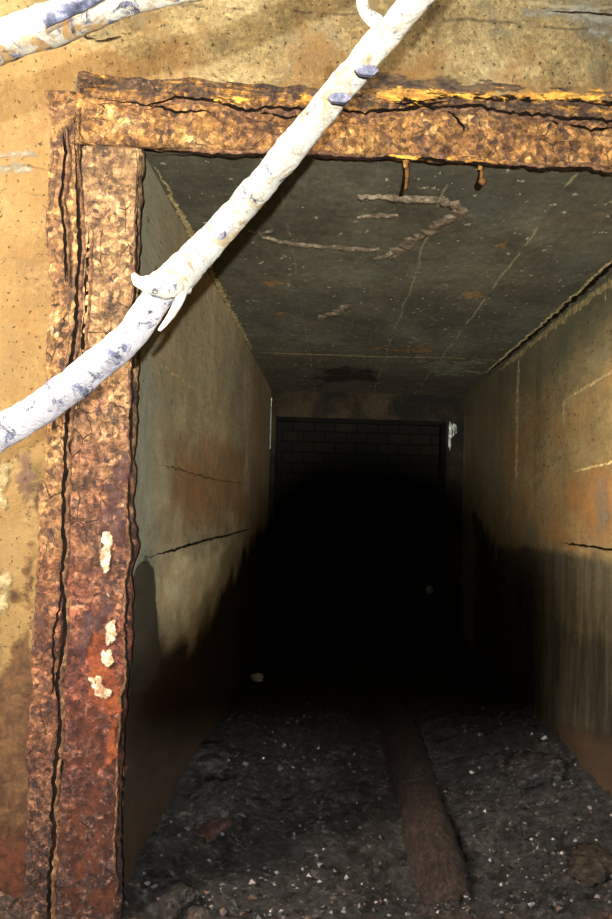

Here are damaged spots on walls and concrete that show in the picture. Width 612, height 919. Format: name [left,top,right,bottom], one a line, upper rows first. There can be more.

corrosion [281,84,314,105]
crack [339,92,612,132]
corrosion [360,72,612,106]
corrosion [389,153,420,191]
crack [305,150,612,175]
corrosion [447,155,509,186]
crack [58,95,306,368]
crack [258,194,470,261]
crack [208,260,612,493]
corrosion [99,455,130,550]
crack [46,405,76,919]
crack [112,357,249,919]